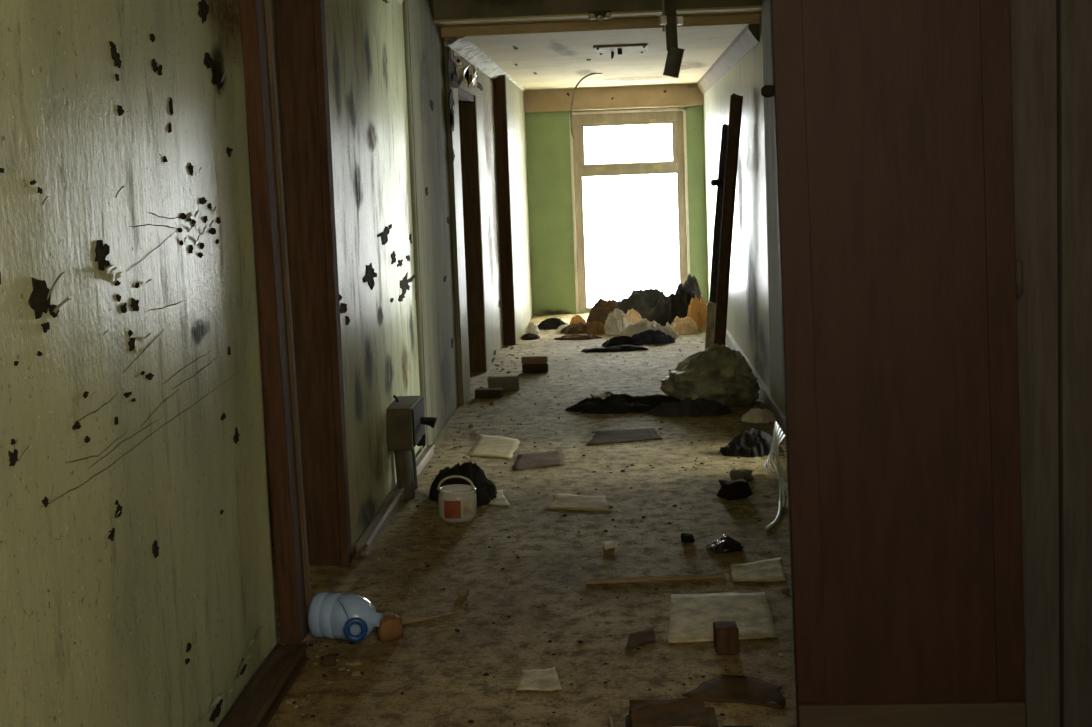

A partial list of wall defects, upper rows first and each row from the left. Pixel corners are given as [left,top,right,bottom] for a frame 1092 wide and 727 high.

spalling [109,41,122,81]
spalling [151,58,162,75]
spalling [95,240,151,313]
spalling [363,263,377,290]
spalling [377,224,416,303]
spalling [28,272,72,333]
spalling [339,294,350,325]
spalling [128,330,151,353]